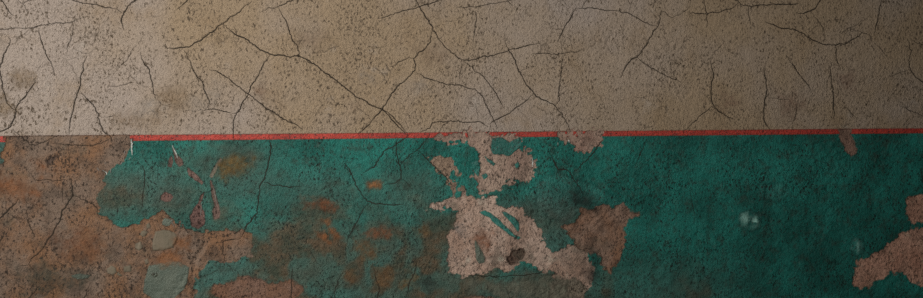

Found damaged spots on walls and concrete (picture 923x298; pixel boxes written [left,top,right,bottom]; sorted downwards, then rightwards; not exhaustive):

crack [164,0,884,242]
peeling [0,135,253,298]
peeling [427,126,640,298]